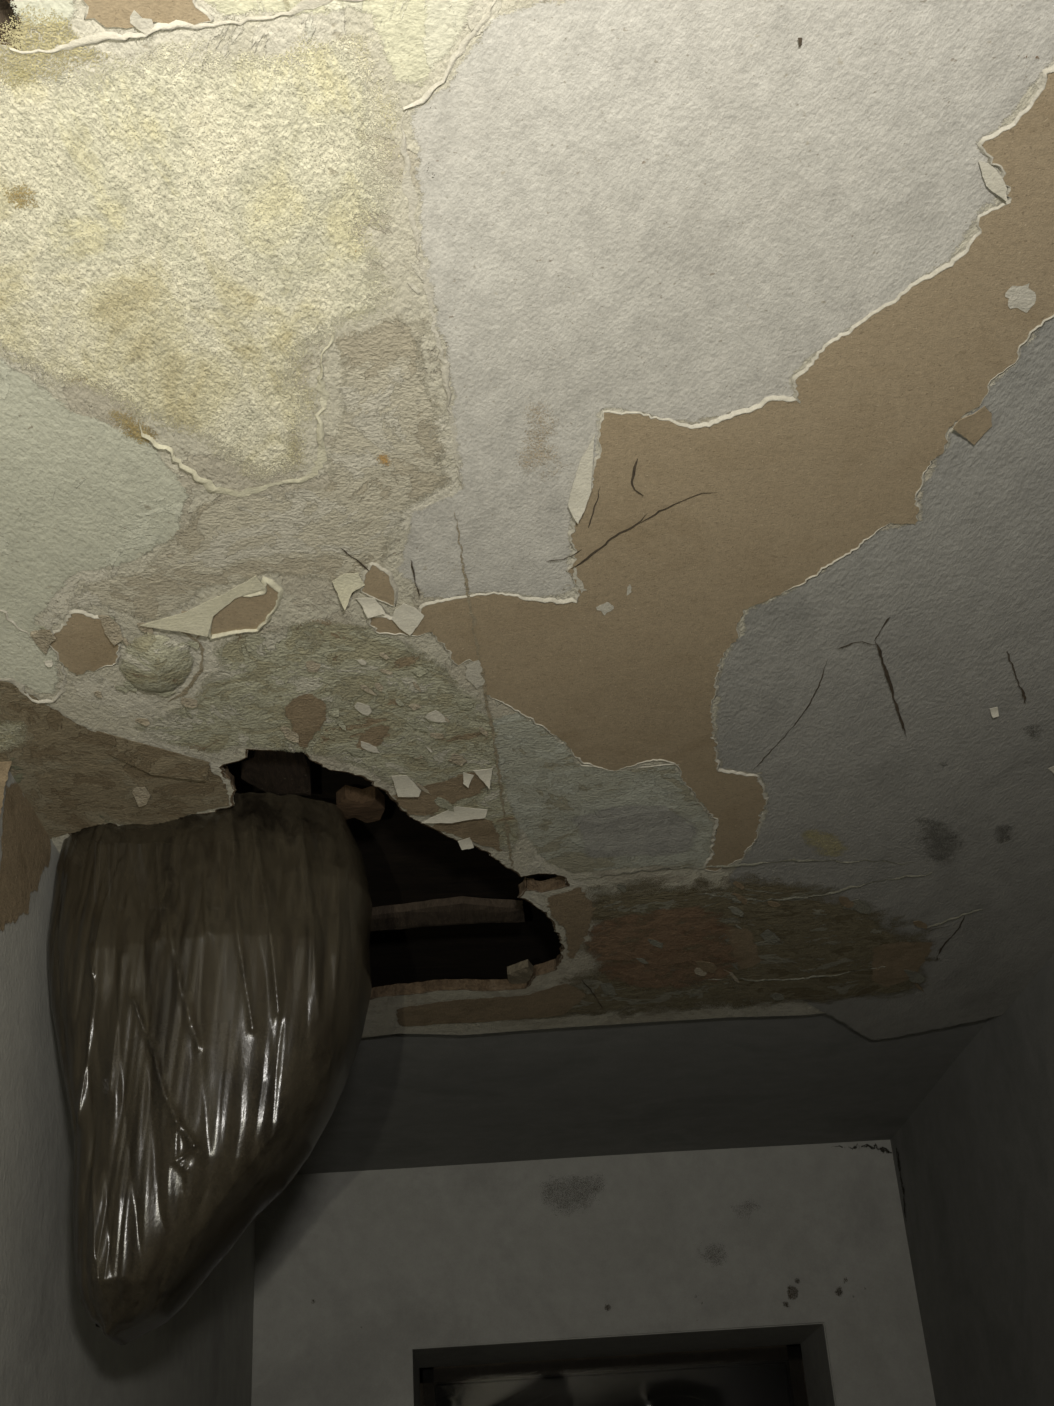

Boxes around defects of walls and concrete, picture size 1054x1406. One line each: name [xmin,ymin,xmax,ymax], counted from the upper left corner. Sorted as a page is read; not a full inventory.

peeling [10,0,214,34]
crack [546,459,717,569]
peeling [280,64,1054,872]
peeling [396,983,586,1026]